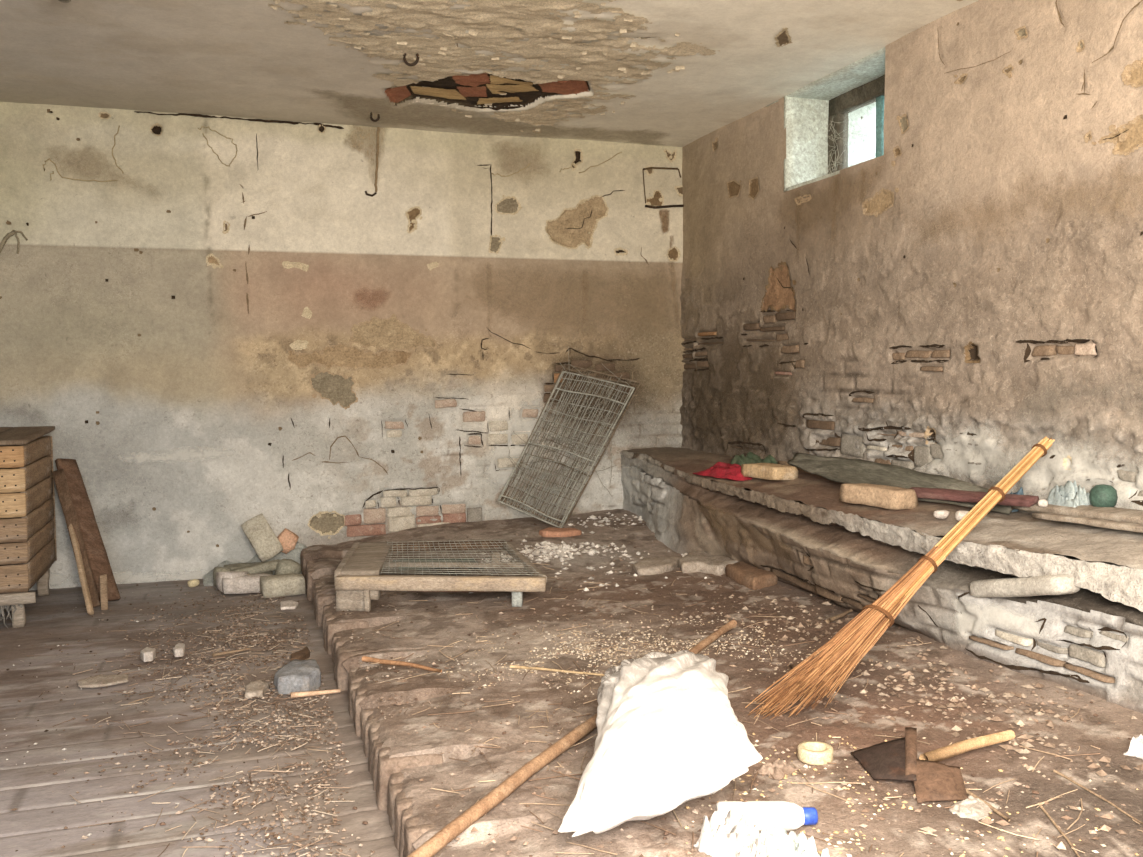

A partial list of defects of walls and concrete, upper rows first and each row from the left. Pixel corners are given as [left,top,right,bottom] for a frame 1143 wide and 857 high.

peeling [268,0,720,133]
crack [938,37,1009,73]
crack [1078,0,1143,108]
flaking render [1084,114,1143,156]
crack [134,111,344,314]
crack [477,165,493,235]
flaking render [545,190,625,249]
flaking render [889,344,950,372]
spalling [964,342,980,363]
flaking render [1016,339,1097,363]
crack [381,327,640,490]
flaking render [308,487,482,539]